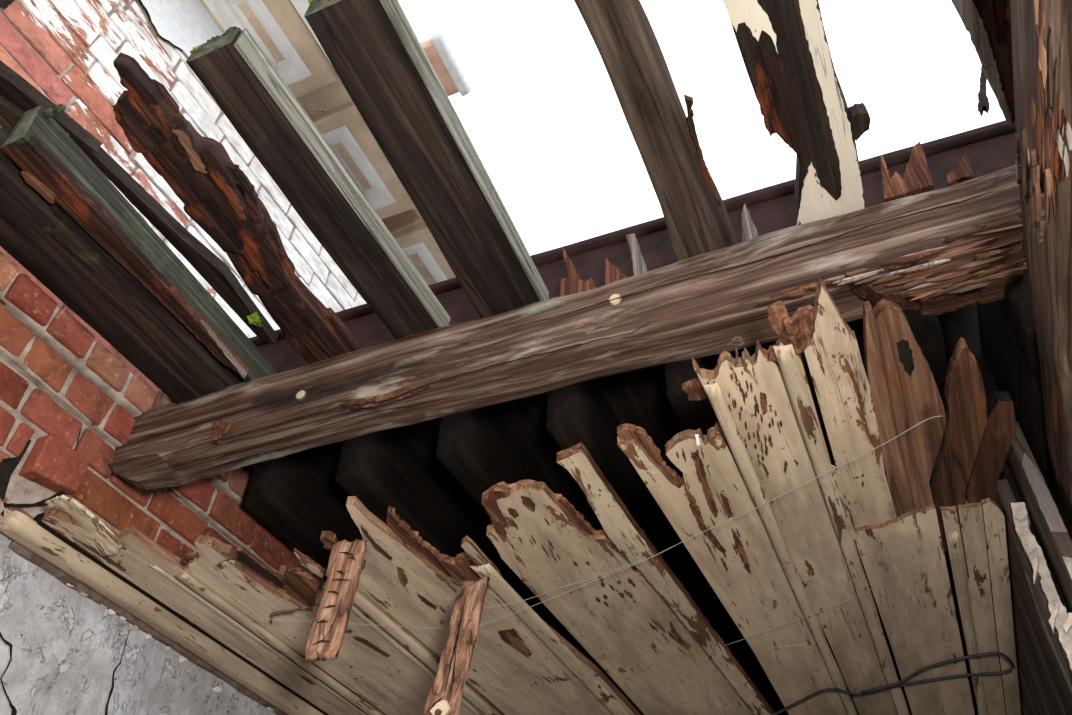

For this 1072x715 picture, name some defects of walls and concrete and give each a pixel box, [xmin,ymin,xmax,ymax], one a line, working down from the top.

spalling [0,439,66,514]
crack [0,632,17,715]
crack [105,624,130,715]